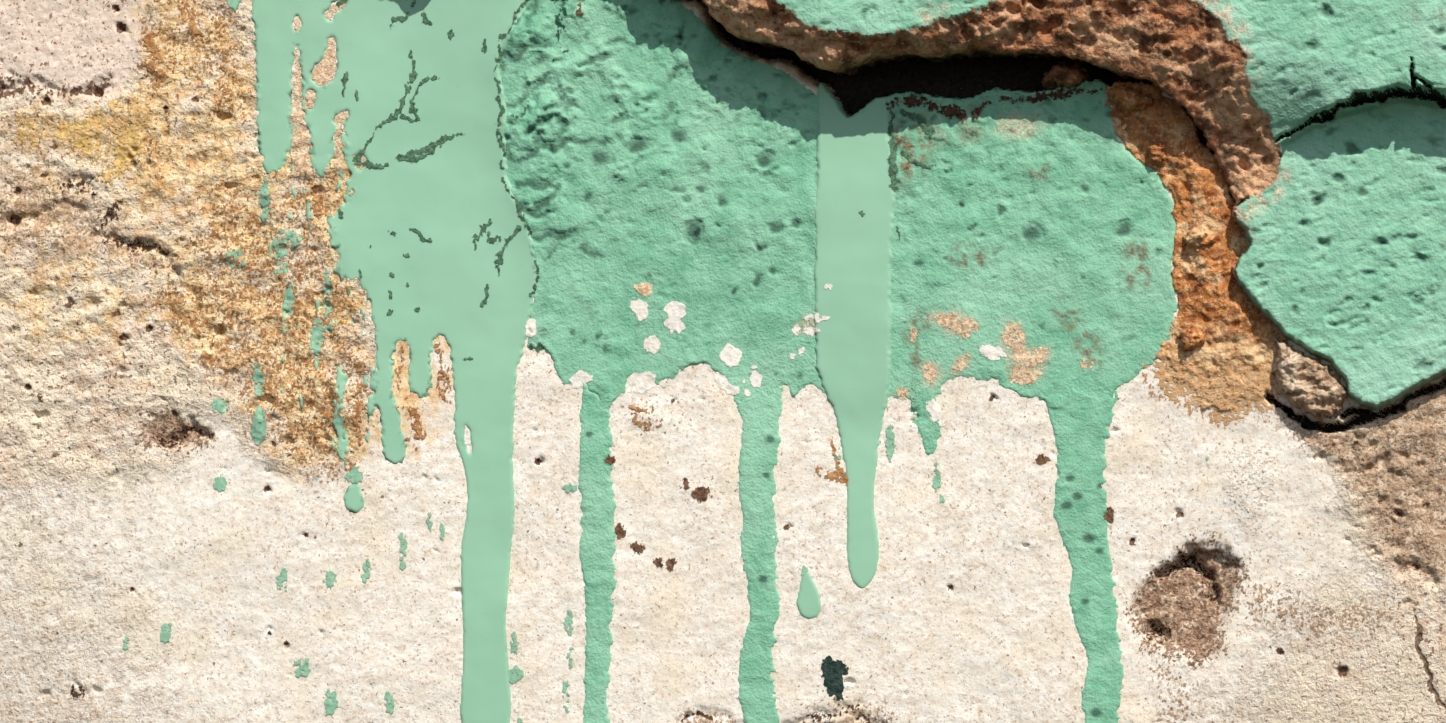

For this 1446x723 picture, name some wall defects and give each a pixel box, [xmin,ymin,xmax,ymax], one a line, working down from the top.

peeling [325,0,347,20]
peeling [289,16,337,177]
crack [1276,58,1446,142]
peeling [333,111,366,180]
spalling [702,0,1293,431]
peeling [630,282,686,354]
peeling [569,370,593,388]
peeling [627,371,656,394]
spalling [150,410,214,451]